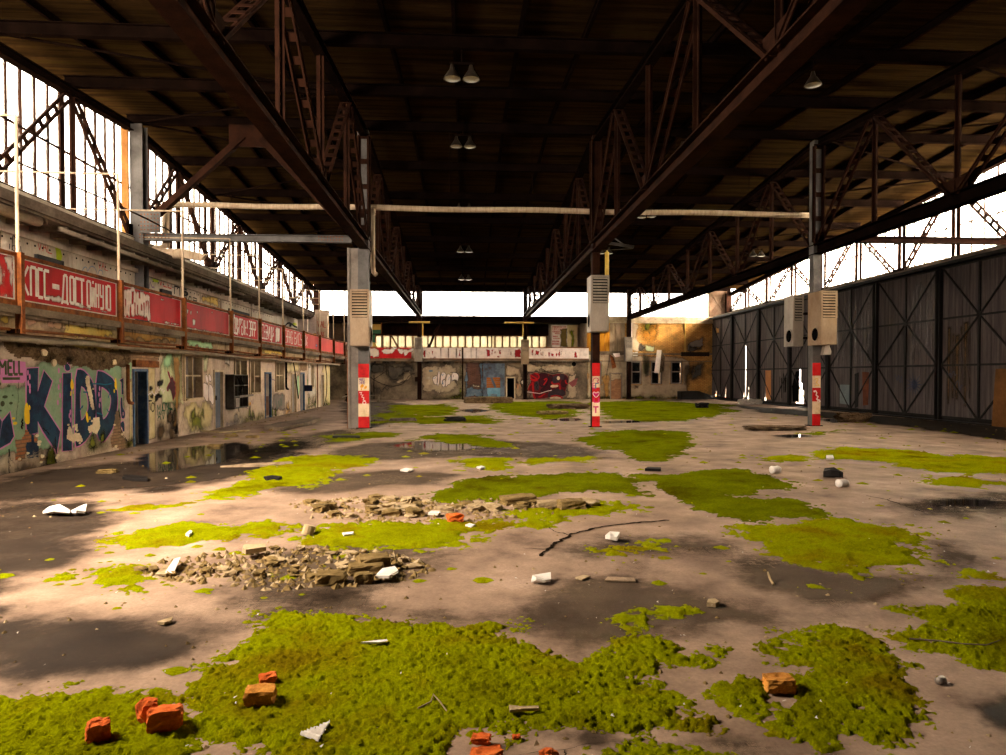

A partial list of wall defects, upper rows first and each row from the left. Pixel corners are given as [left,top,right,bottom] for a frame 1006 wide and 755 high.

leakage [0,402,605,593]
spalling [446,513,464,522]
crack [522,520,666,556]
leakage [899,492,1006,518]
leakage [0,606,212,680]
leakage [228,546,448,618]
leakage [413,609,458,624]
leakage [520,575,775,647]